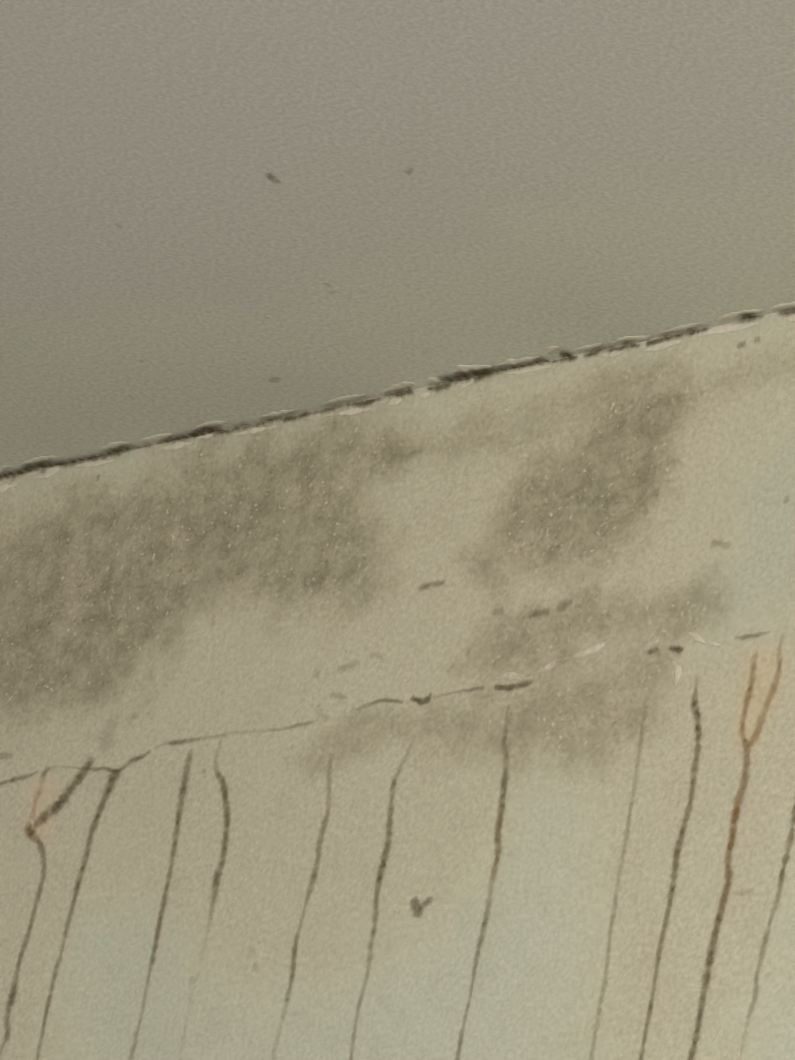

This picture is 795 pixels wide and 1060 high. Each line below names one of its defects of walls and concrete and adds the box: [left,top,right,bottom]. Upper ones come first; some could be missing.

damp [0,444,292,916]
damp [266,435,468,691]
crack [0,301,795,493]
crack [391,695,430,703]
damp [306,558,547,883]
crack [493,640,605,690]
damp [466,365,731,622]
damp [621,924,693,1039]
damp [616,689,746,905]
crack [643,632,722,686]
corrosion [688,712,747,1060]
damp [720,753,795,921]